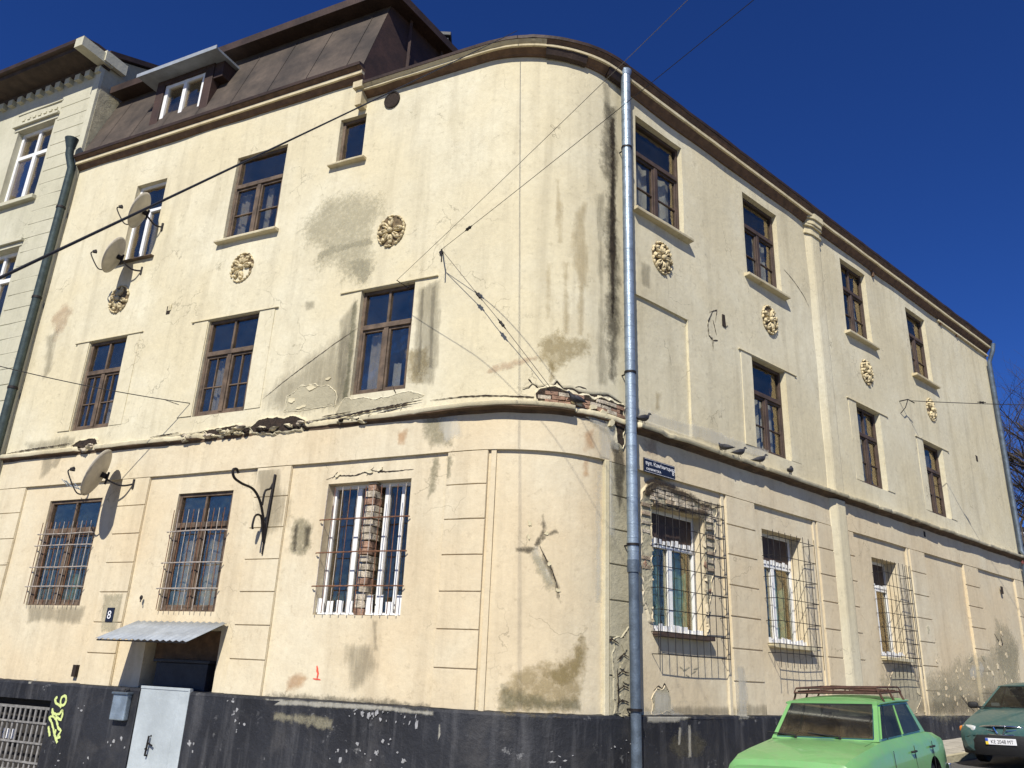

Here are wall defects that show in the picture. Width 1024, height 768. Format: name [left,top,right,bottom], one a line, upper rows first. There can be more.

damp [605,106,619,377]
flaking render [71,437,100,448]
flaking render [203,377,424,439]
crack [326,467,413,480]
flaking render [533,385,625,452]
flaking render [638,478,720,632]
peeling [349,709,418,729]
peeling [651,685,675,715]